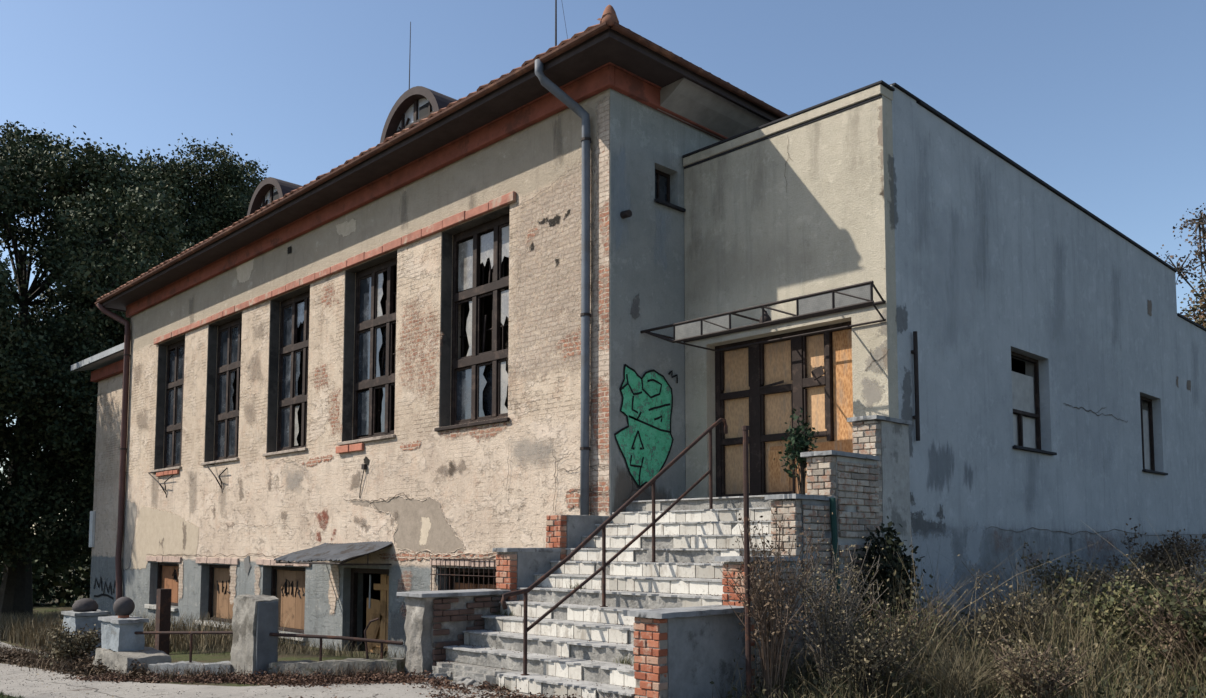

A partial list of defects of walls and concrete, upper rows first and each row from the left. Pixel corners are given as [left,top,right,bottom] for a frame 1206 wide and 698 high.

flaking render [335,218,356,237]
flaking render [236,259,254,283]
flaking render [513,96,609,514]
flaking render [862,309,887,407]
flaking render [314,365,342,435]
crack [1063,403,1126,422]
spalling [349,456,497,591]
flaking render [178,523,186,601]
flaking render [229,555,261,604]
flaking render [327,562,340,615]